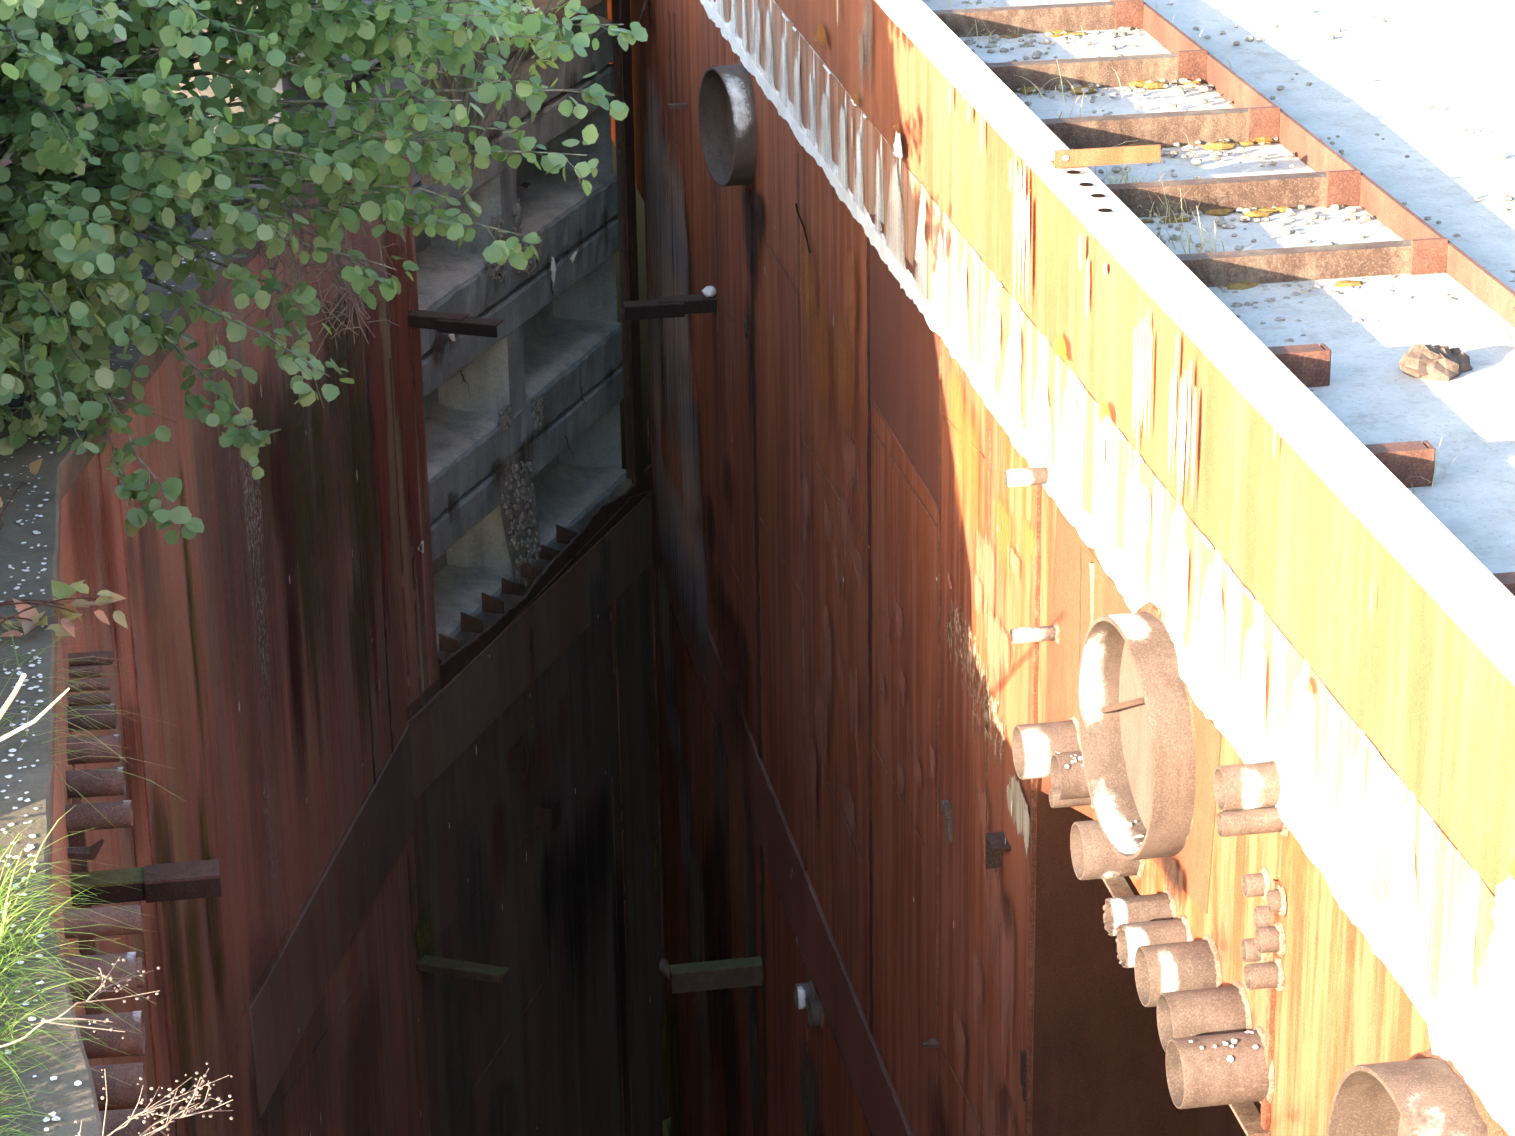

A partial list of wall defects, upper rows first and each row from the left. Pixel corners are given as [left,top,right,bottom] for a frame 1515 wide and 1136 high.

damp [709,0,1152,543]
corrosion [950,370,976,518]
corrosion [1054,333,1067,361]
corrosion [1099,402,1110,423]
corrosion [272,411,306,742]
damp [1168,331,1266,761]
damp [947,601,1004,764]
damp [1282,680,1315,832]
damp [1357,729,1383,760]
damp [1158,856,1182,895]
damp [1386,837,1420,981]
damp [1448,877,1515,1114]